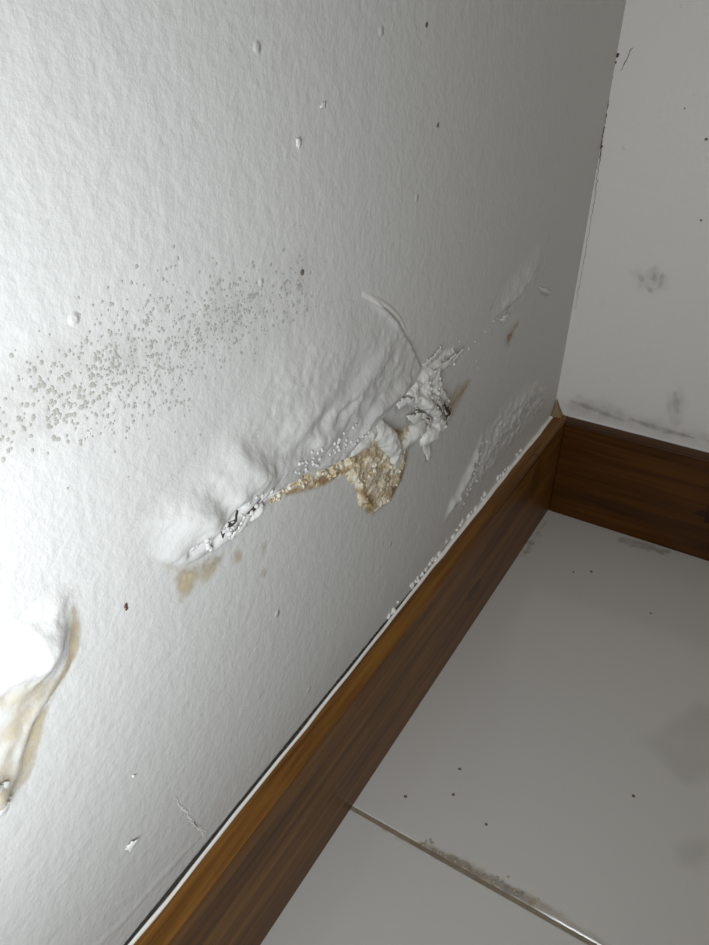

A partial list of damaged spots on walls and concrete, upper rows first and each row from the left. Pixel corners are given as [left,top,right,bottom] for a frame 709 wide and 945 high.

leakage [0,245,314,463]
spalling [269,346,465,514]
leakage [55,614,79,689]
leakage [10,712,46,778]